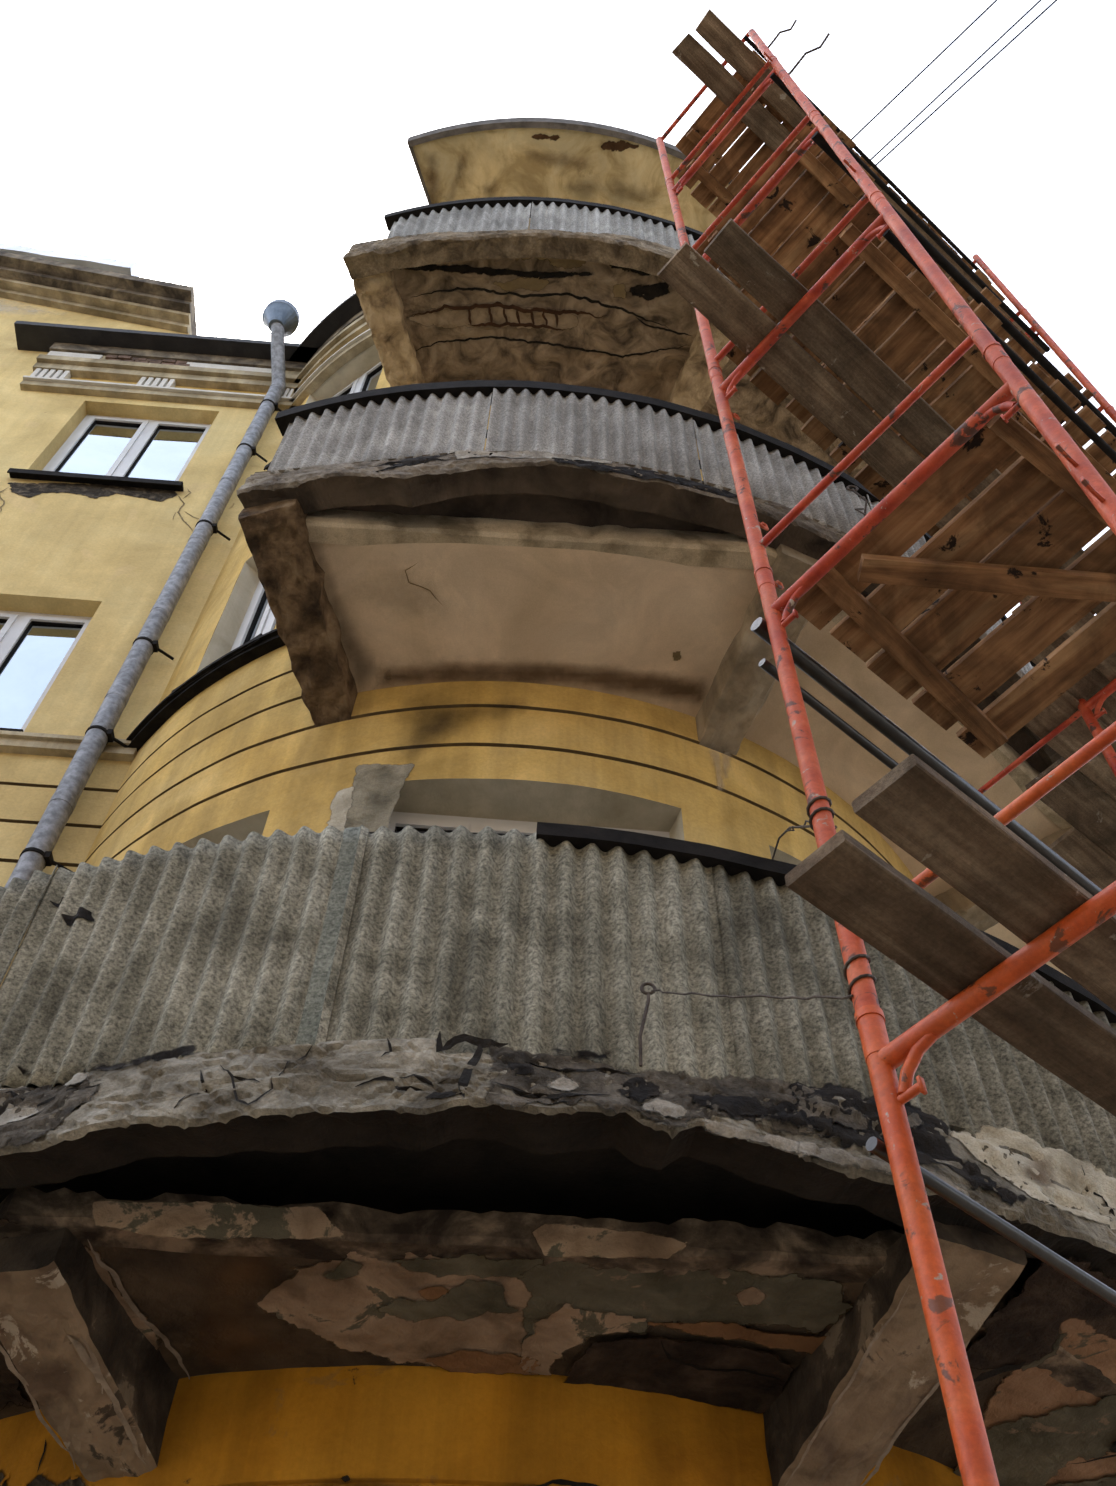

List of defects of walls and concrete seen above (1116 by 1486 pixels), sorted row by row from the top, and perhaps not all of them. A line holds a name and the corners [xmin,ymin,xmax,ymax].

crack [173,490,199,531]
spalling [0,1045,196,1147]
spalling [485,982,892,1173]
spalling [904,1101,1027,1206]
spalling [966,1257,1116,1382]
spalling [0,1345,85,1486]
spalling [67,1335,145,1464]
crack [537,1478,598,1486]